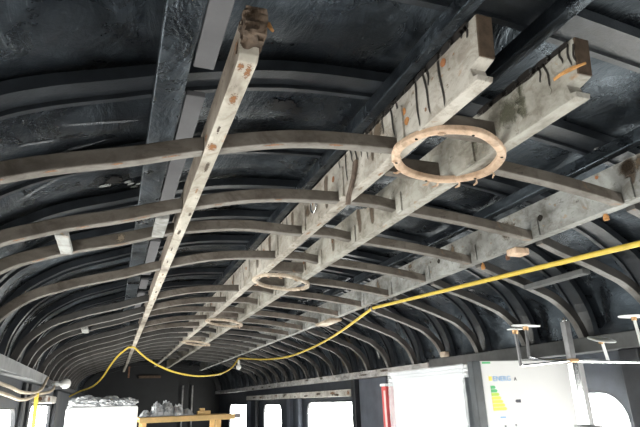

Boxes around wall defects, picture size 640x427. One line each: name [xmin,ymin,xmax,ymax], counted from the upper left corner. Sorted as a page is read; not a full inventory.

damp [477,41,577,125]
damp [619,155,640,184]